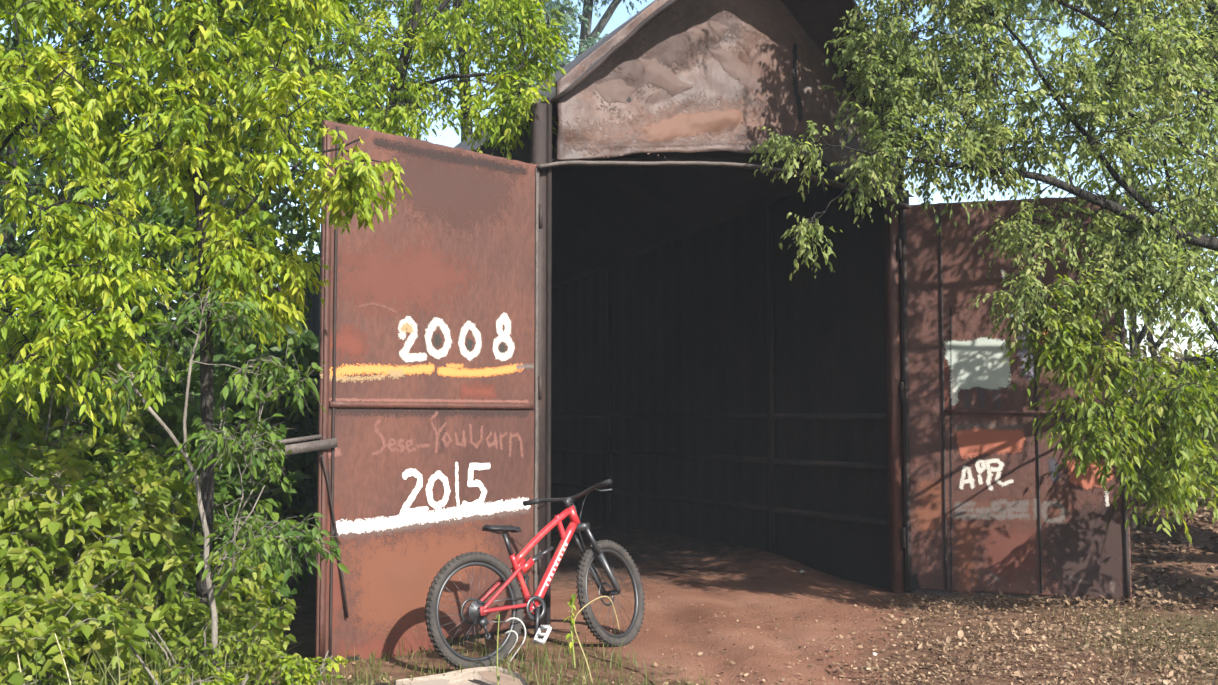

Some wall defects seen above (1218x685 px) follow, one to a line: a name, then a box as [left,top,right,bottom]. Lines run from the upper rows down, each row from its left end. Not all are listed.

corrosion [559,21,845,158]